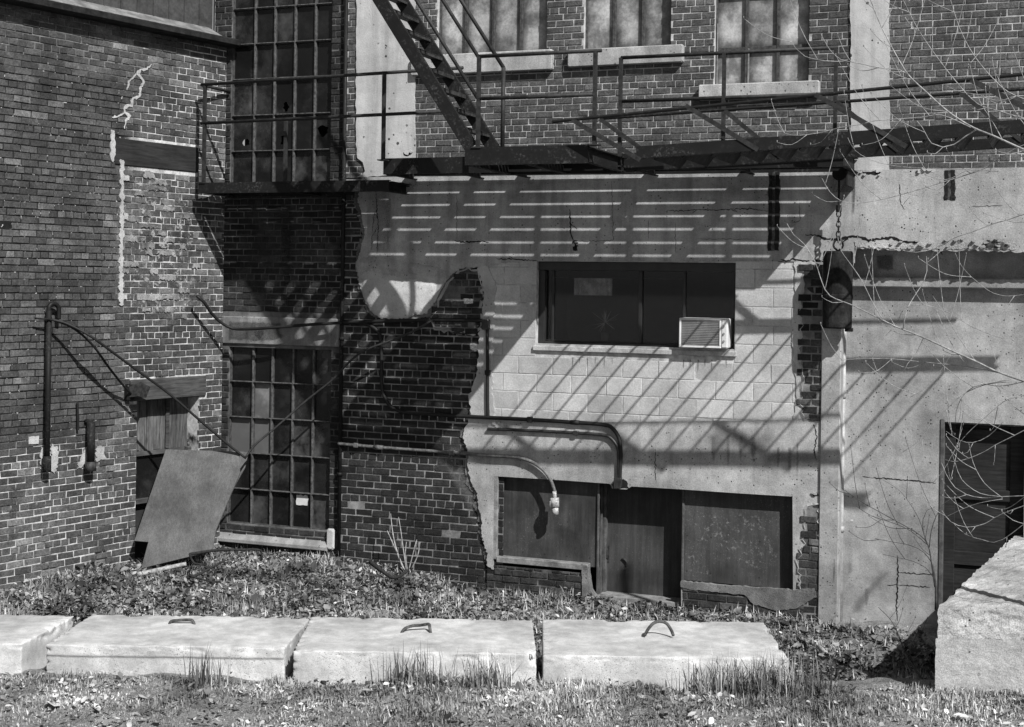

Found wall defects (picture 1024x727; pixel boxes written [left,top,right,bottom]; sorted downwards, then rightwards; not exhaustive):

crack [112,64,152,129]
crack [778,234,943,262]
spalling [855,237,1016,251]
flaking render [796,261,823,421]
flaking render [460,429,488,565]
flaking render [794,492,819,621]
crack [889,556,931,621]